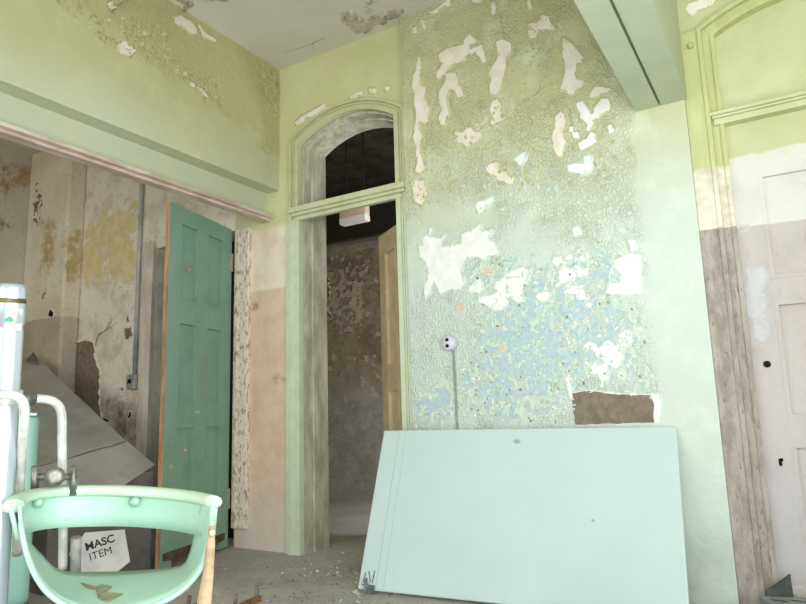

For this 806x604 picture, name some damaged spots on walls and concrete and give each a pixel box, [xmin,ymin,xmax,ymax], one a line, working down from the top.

peeling [172,0,217,44]
peeling [340,0,404,34]
peeling [685,0,725,18]
peeling [293,103,330,126]
peeling [405,0,664,429]
flaking render [327,261,373,339]
spalling [75,339,109,423]